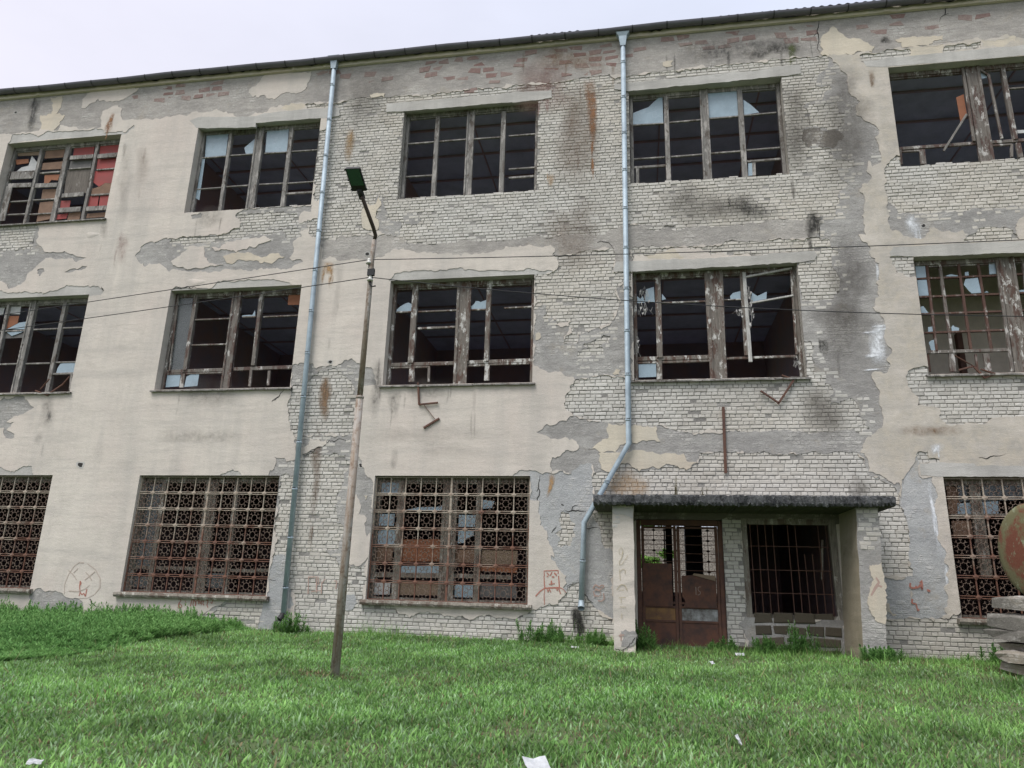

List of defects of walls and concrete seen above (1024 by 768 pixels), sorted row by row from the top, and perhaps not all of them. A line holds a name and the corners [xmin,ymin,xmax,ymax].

rust [586,91,596,174]
water stain [808,214,820,248]
peeling [0,1,1024,578]
water stain [865,325,886,370]
rust [320,380,330,414]
flaking render [269,359,637,653]